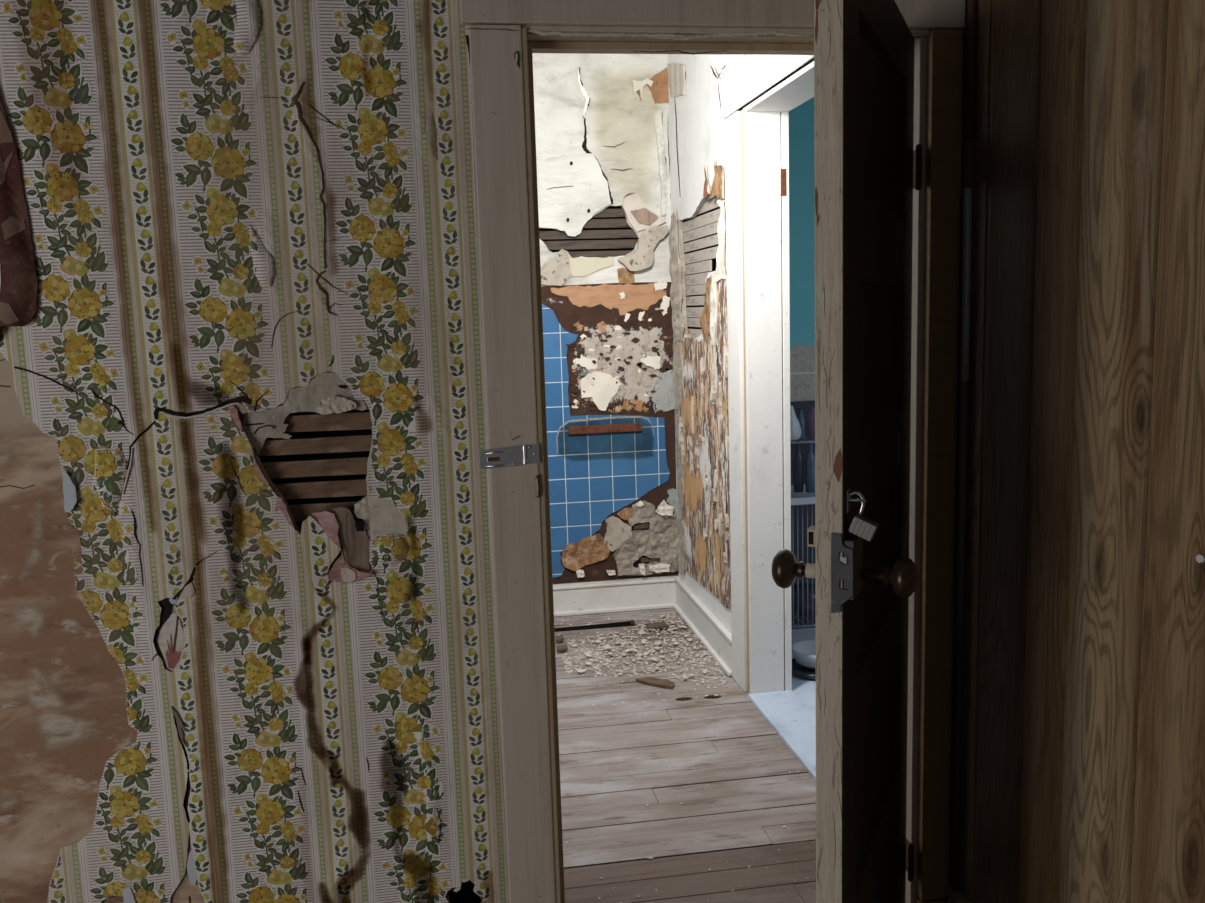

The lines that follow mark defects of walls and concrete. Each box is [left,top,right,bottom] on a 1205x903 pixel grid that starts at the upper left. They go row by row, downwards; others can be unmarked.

peeling [0,94,39,335]
crack [262,82,347,316]
crack [577,67,636,204]
flaking render [0,352,137,903]
crack [14,366,268,667]
crack [171,706,191,822]
spalling [228,372,408,541]
leakage [294,588,369,903]
spalling [536,153,731,609]
spalling [448,881,482,903]